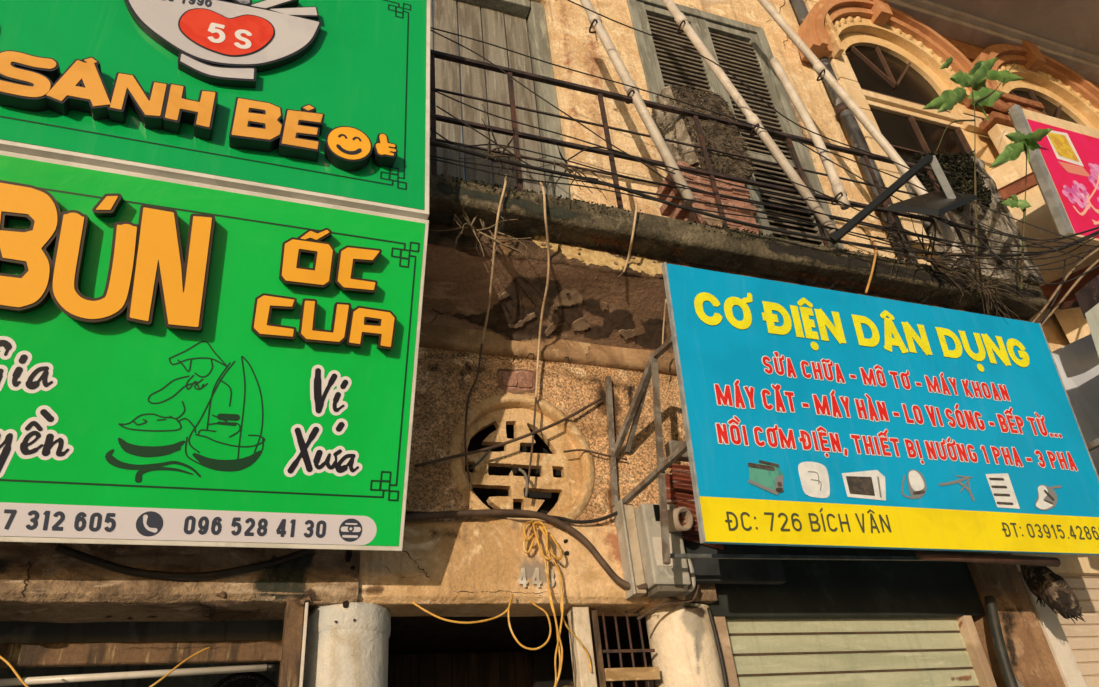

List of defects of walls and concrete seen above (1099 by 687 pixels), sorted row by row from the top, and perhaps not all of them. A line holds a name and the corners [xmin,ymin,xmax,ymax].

leakage [436,183,577,242]
spalling [701,211,723,227]
peeling [529,233,663,279]
spalling [453,276,666,348]
spalling [496,368,536,394]
crack [19,560,146,611]
leakage [255,553,314,612]